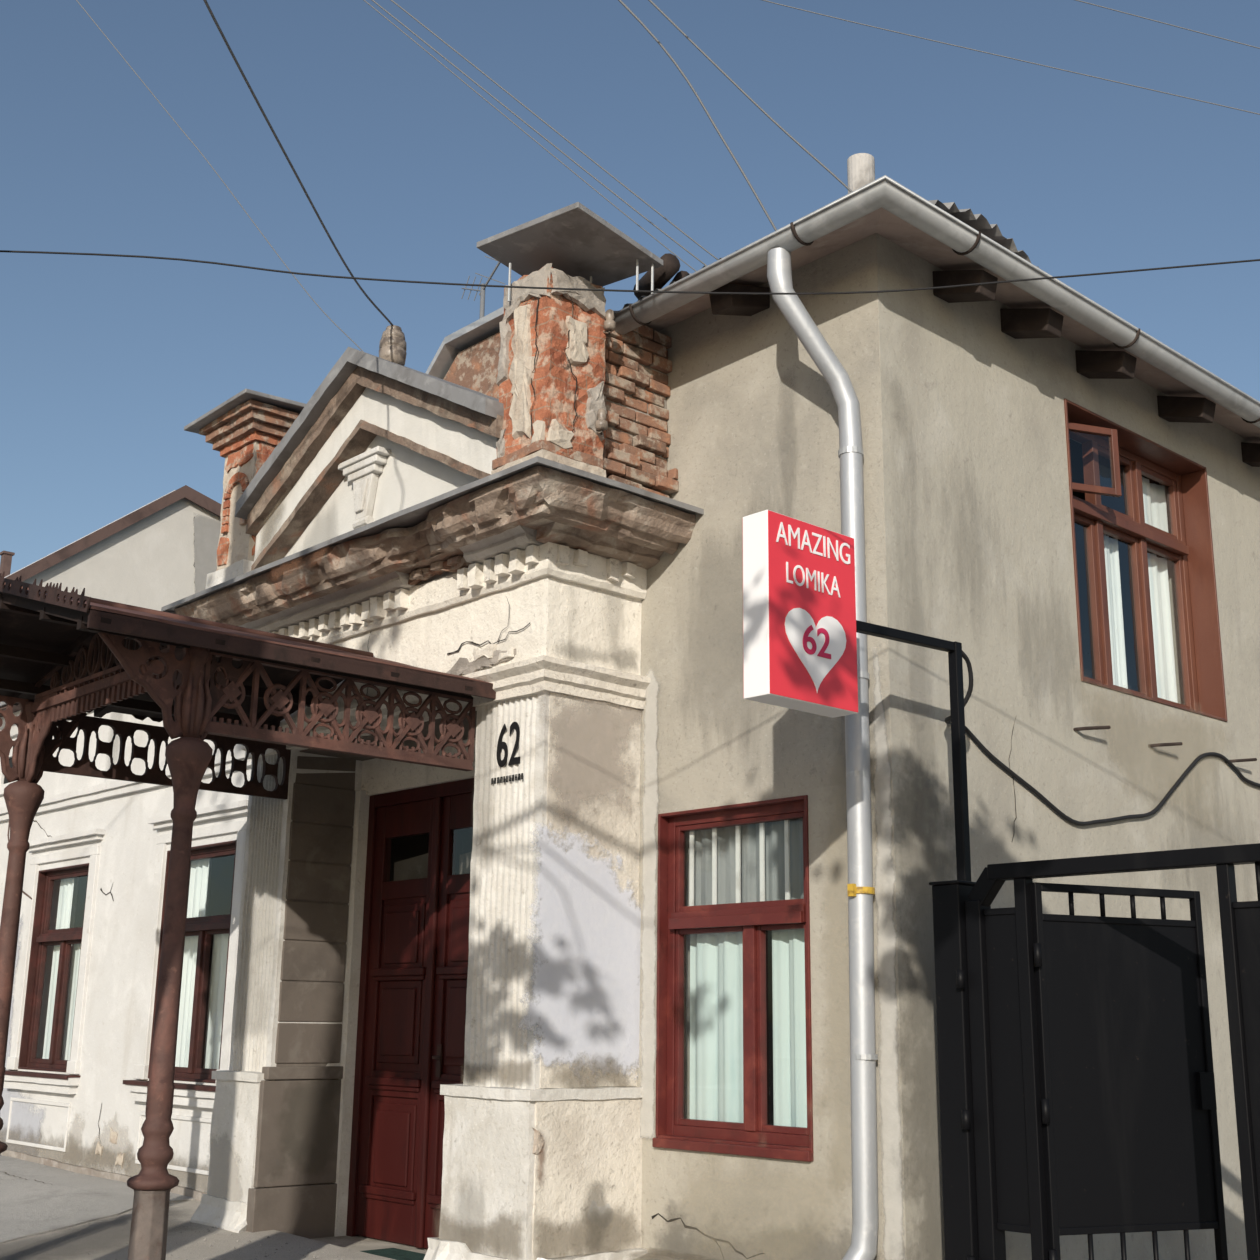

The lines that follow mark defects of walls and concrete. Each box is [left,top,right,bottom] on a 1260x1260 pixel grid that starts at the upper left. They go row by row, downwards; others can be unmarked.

peeling [496,263,607,469]
spalling [225,441,275,475]
spalling [217,537,230,567]
crack [447,596,530,655]
crack [651,1213,764,1259]